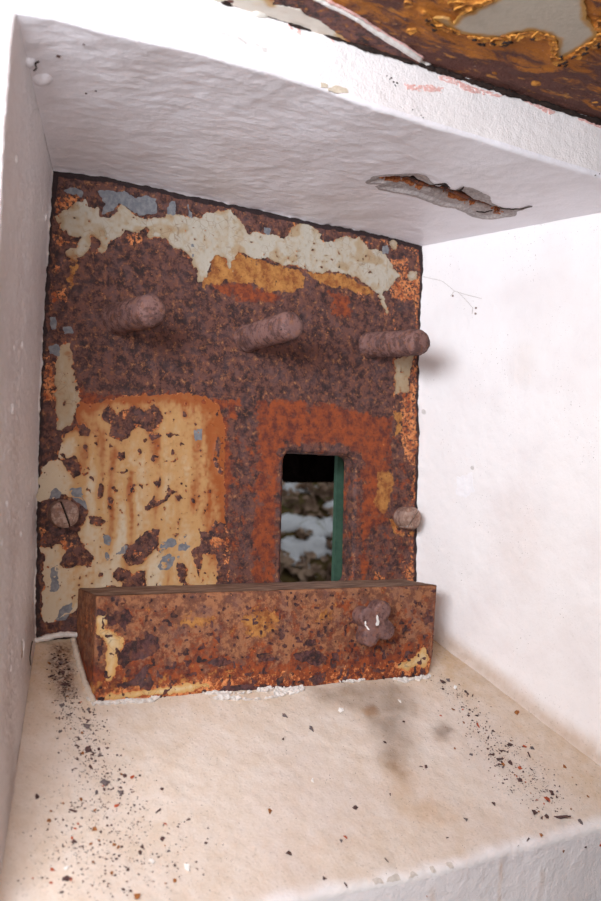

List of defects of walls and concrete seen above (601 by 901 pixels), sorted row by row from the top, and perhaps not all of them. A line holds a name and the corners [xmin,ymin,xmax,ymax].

peeling [406,0,601,68]
spalling [365,174,532,220]
rust [96,589,434,701]